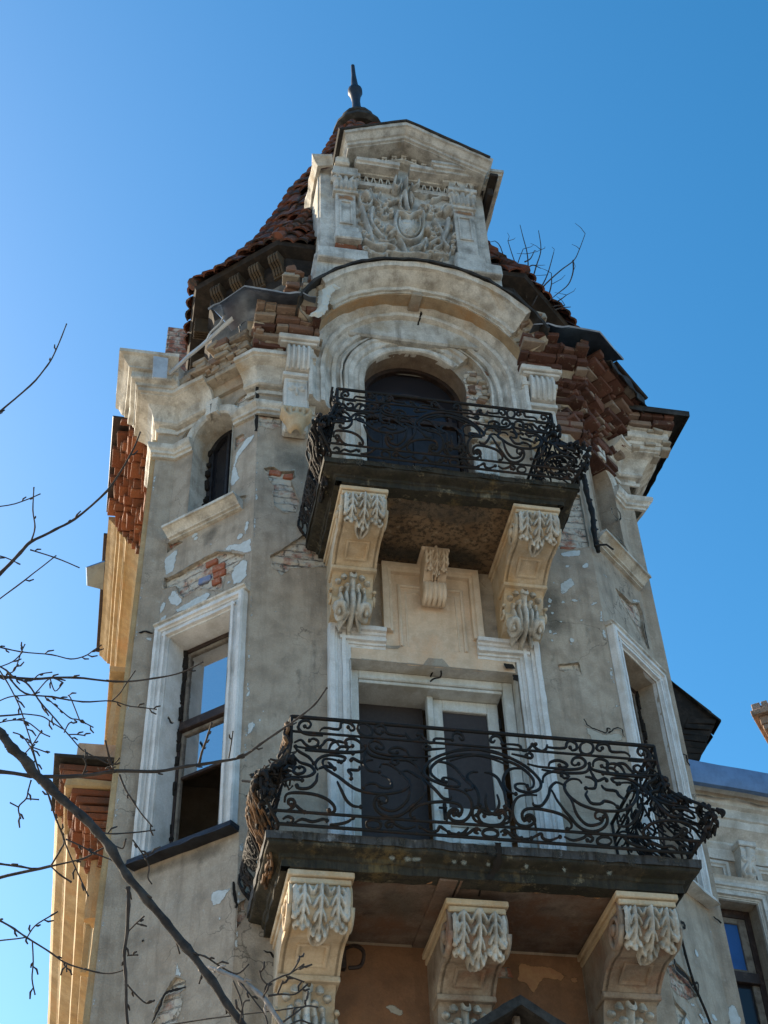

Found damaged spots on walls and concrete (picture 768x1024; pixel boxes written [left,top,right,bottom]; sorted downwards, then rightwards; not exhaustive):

flaking render [231,415,282,500]
flaking render [256,466,302,513]
flaking render [159,519,256,620]
flaking render [270,535,327,576]
crack [583,719,625,737]
flaking render [151,965,186,1024]
peeling [517,963,578,993]